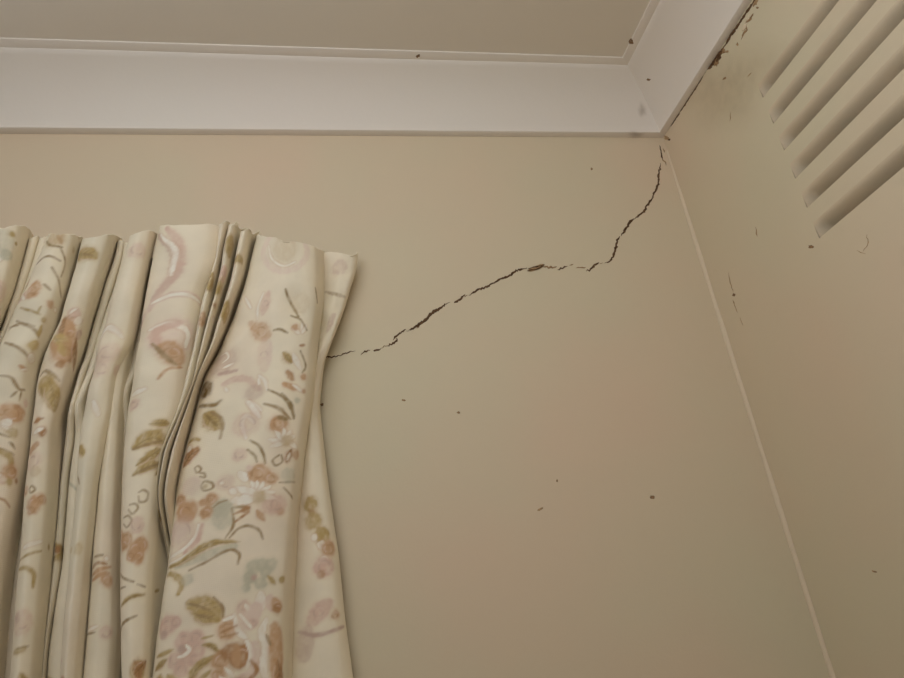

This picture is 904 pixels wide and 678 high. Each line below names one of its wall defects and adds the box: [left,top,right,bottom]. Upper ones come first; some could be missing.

crack [326,0,755,358]